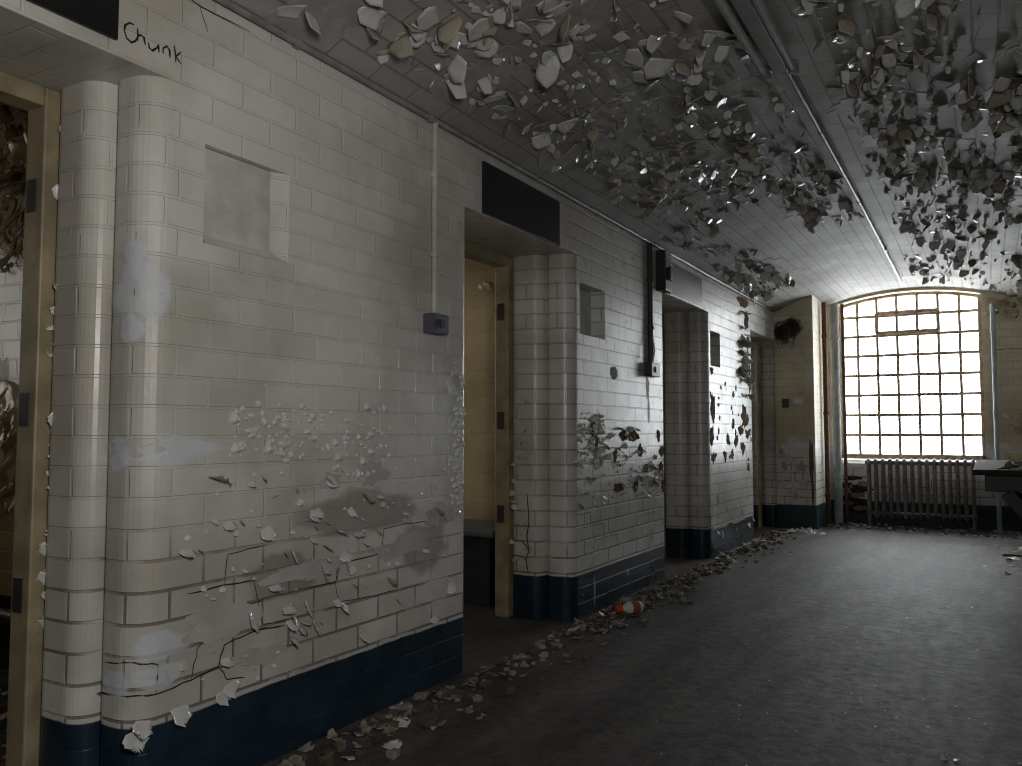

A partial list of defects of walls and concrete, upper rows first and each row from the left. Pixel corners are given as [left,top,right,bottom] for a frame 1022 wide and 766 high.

peeling [790,0,1022,319]
peeling [0,102,28,385]
peeling [264,0,865,471]
peeling [209,474,233,495]
peeling [576,422,665,510]
peeling [231,457,462,619]
peeling [180,585,323,680]
peeling [122,720,153,754]
peeling [170,704,193,727]
peeling [215,679,240,706]